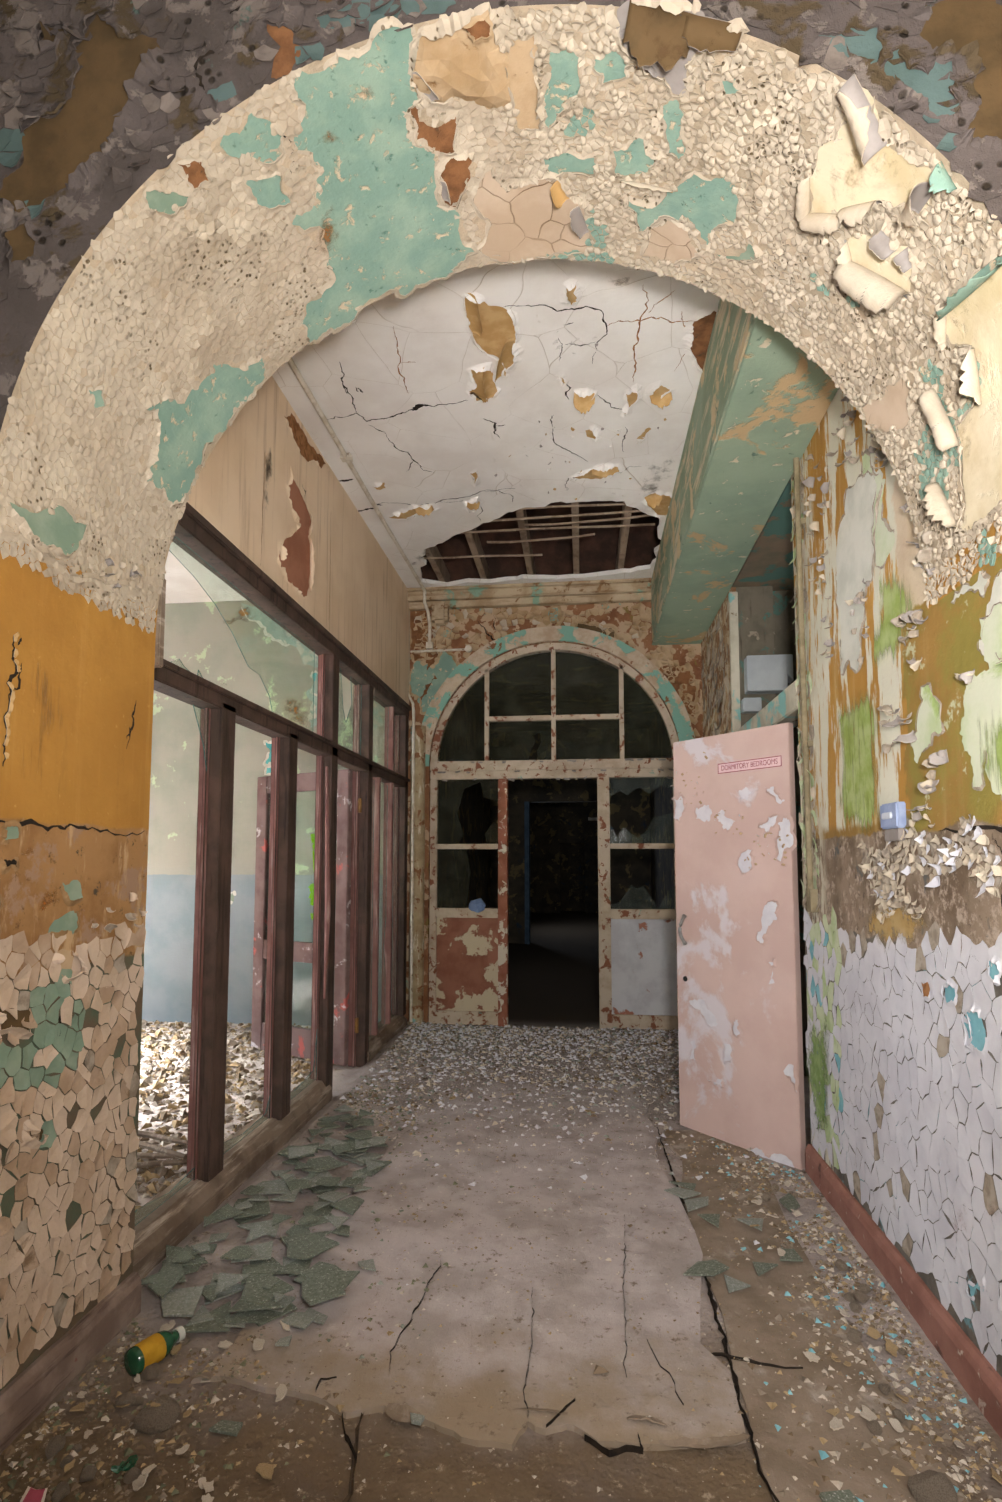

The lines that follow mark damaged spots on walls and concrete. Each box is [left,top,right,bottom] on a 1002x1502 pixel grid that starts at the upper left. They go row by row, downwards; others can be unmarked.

crack [327,327,515,520]
peeling [0,0,1002,800]
crack [505,290,688,490]
crack [2,632,22,766]
peeling [409,464,1002,1370]
peeling [0,880,146,1389]
spalling [64,1425,104,1473]
crack [316,1376,364,1502]
crack [523,1287,644,1457]
peeling [627,1414,750,1449]
crack [704,1276,803,1502]
spalling [826,1393,909,1432]